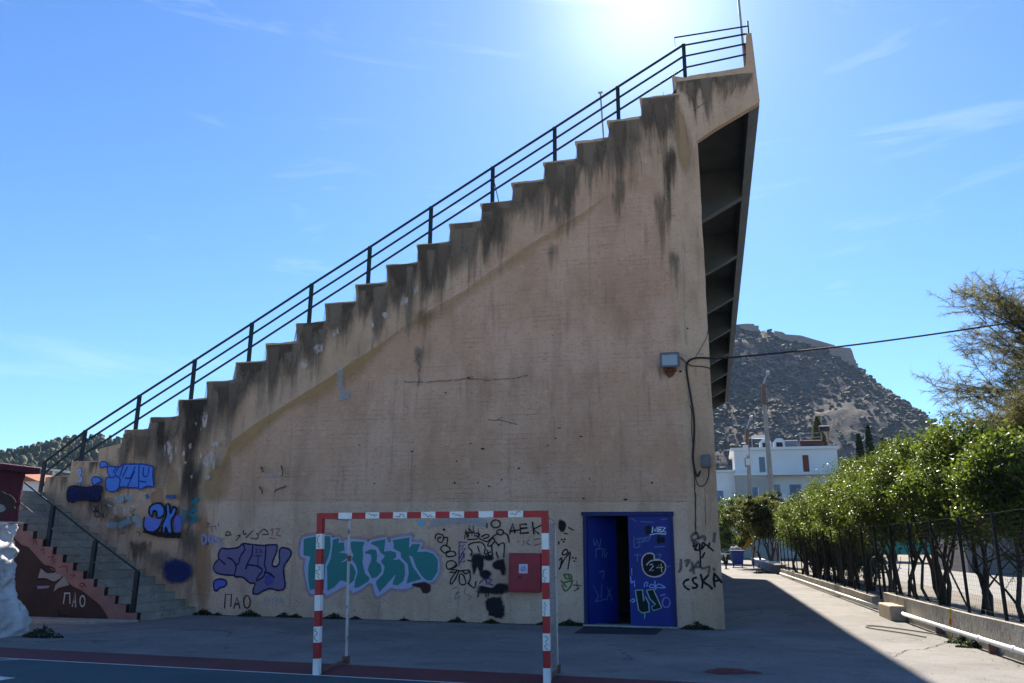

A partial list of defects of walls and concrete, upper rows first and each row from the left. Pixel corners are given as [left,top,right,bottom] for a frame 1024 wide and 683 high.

damp [117,73,752,598]
crack [404,354,528,385]